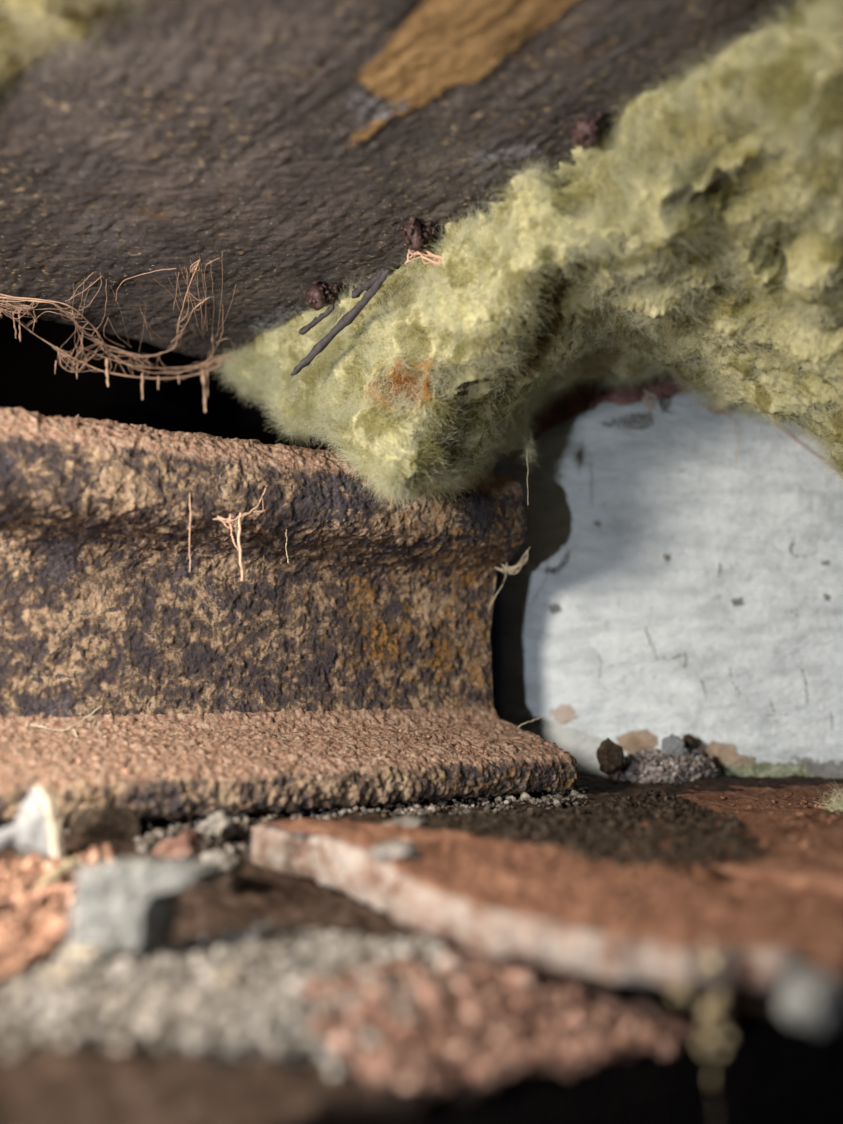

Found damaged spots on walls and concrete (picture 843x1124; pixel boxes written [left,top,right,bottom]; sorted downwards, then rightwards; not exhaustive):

corrosion [346,577,407,669]